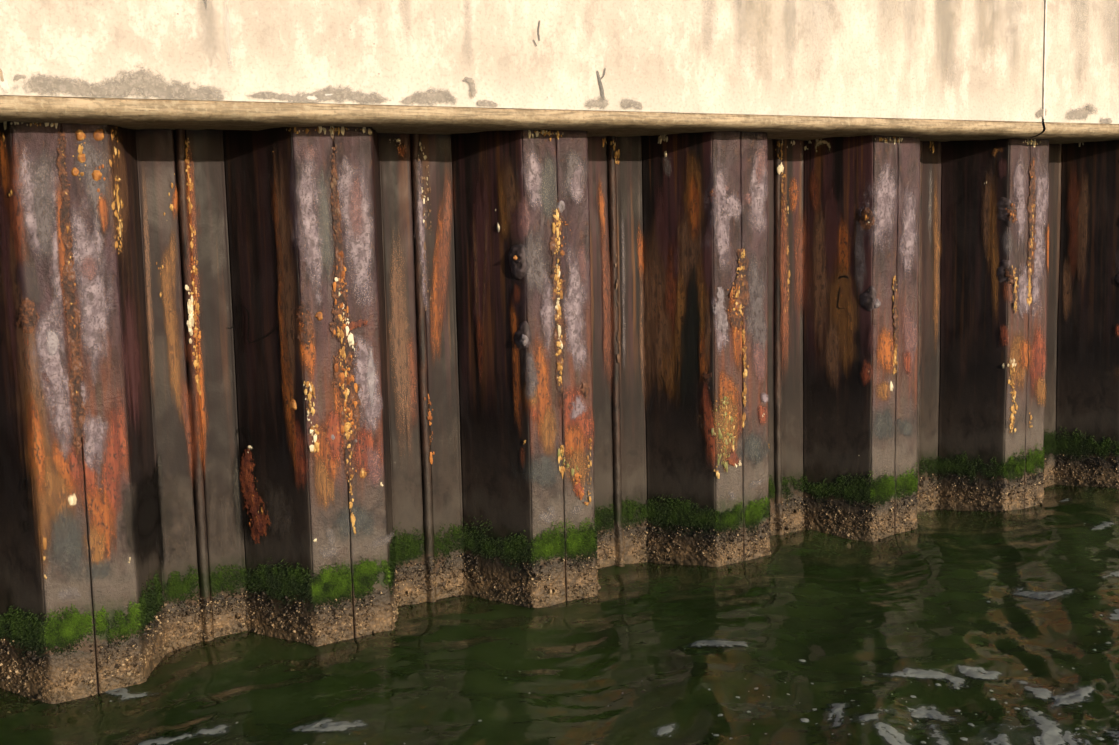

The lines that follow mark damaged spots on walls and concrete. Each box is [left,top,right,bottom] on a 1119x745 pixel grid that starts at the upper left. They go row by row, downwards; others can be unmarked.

leakage [463,77,497,107]
corrosion [0,126,206,565]
corrosion [275,134,384,534]
corrosion [389,245,435,464]
corrosion [389,138,455,350]
corrosion [512,200,594,506]
corrosion [599,159,769,479]
corrosion [775,140,917,439]
corrosion [982,148,1007,310]
corrosion [1002,327,1046,433]
corrosion [232,445,270,544]